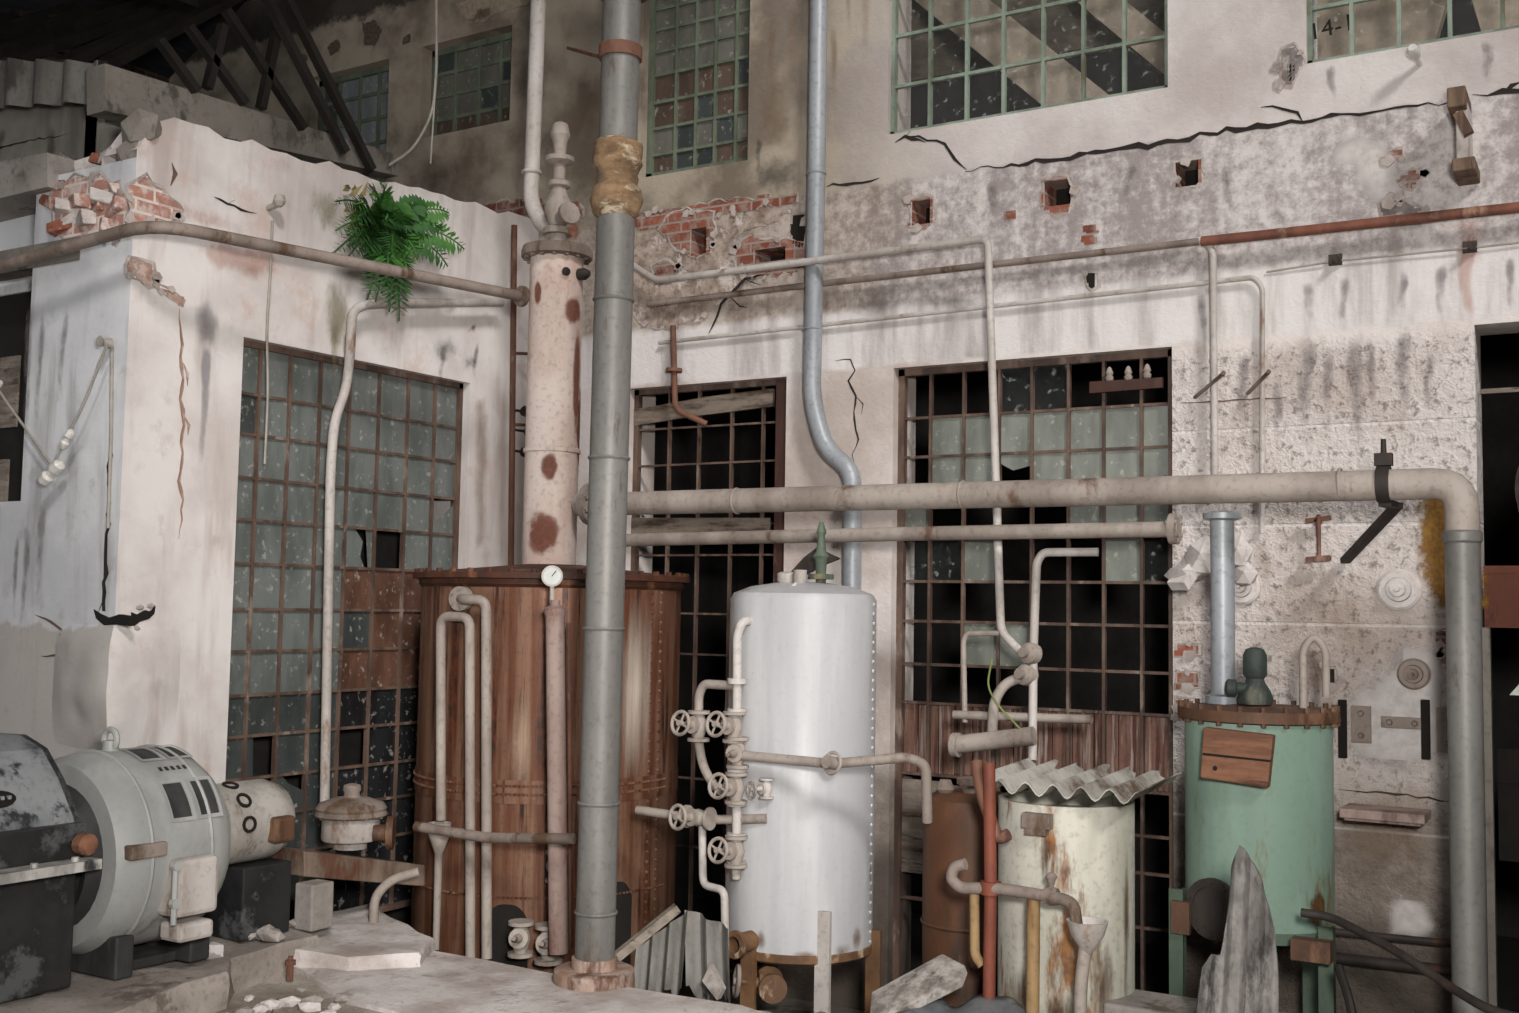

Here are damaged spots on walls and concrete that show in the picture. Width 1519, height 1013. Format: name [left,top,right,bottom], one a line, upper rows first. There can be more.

crack [896,82,1519,172]
flaking render [49,108,186,307]
flaking render [633,192,806,331]
flaking render [902,192,938,233]
flaking render [1039,173,1080,219]
flaking render [1081,224,1099,245]
flaking render [1172,156,1209,189]
crack [177,308,190,535]